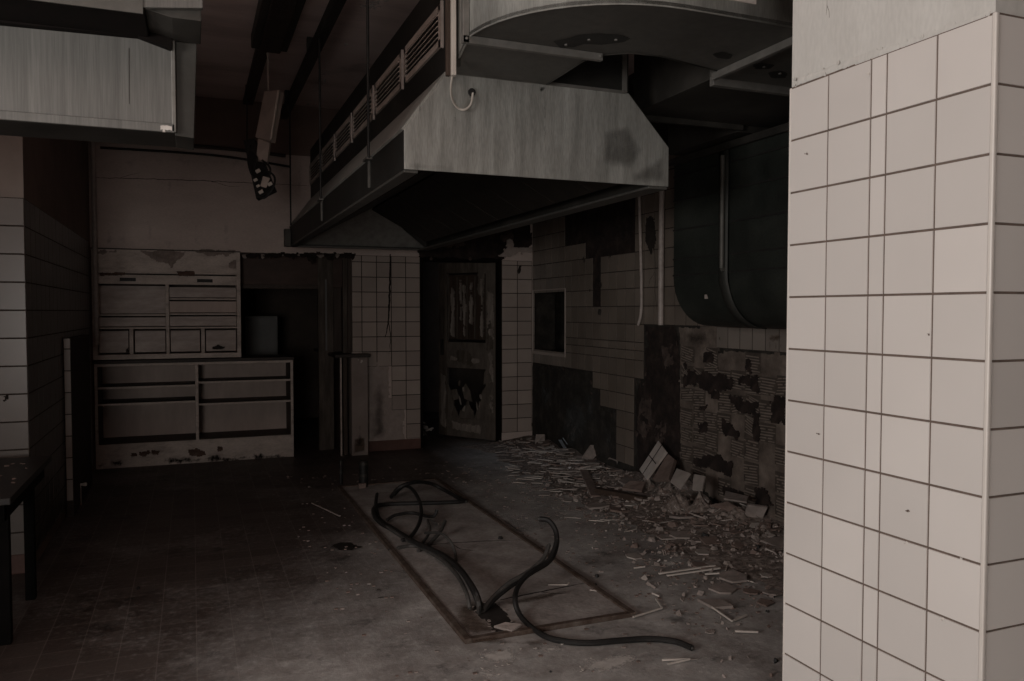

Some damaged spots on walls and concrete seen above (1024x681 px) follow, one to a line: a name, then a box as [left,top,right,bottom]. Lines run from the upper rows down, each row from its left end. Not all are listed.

peeling [532,365,618,468]
spalling [635,325,681,480]
spalling [745,503,768,518]